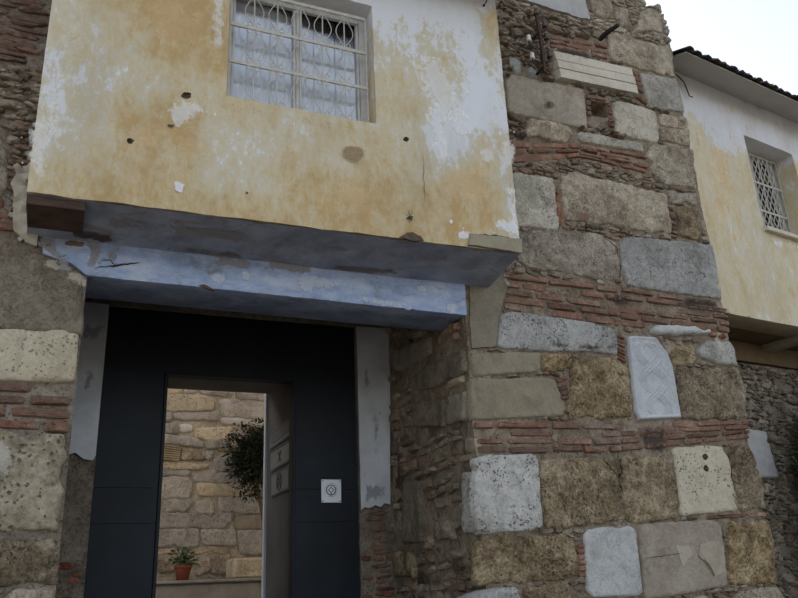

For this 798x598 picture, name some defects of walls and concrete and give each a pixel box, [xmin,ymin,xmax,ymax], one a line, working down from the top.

peeling [168,92,203,127]
peeling [481,139,515,165]
peeling [493,207,518,234]
damp [73,232,116,243]
crack [97,260,140,268]